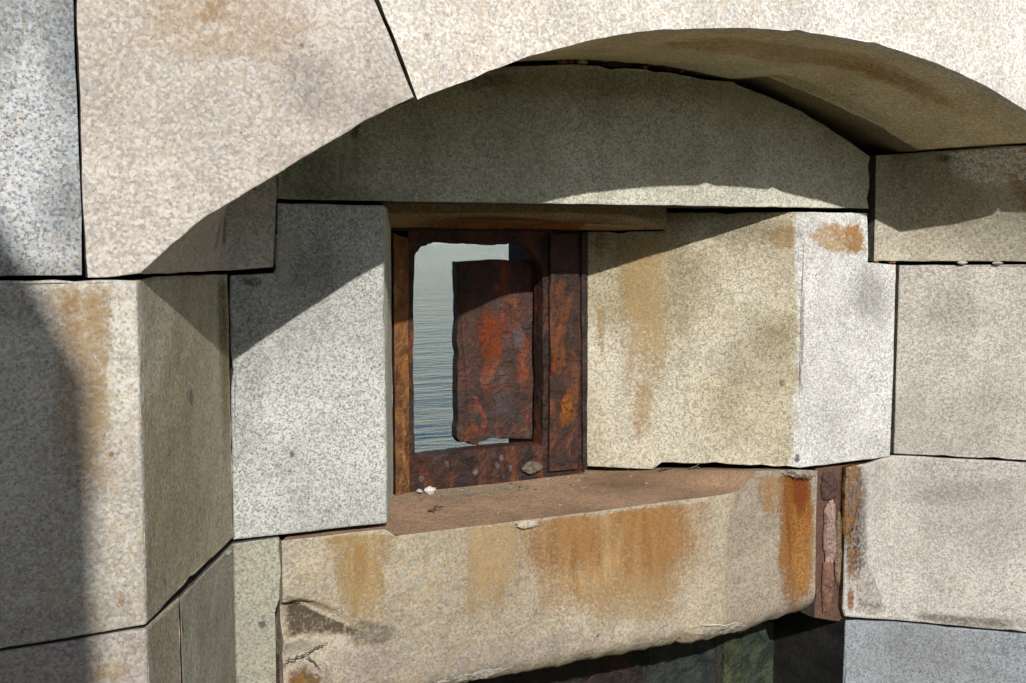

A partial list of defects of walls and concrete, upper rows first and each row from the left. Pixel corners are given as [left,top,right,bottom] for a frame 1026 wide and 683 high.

corrosion [813,224,864,252]
corrosion [559,389,574,425]
corrosion [760,475,814,601]
corrosion [843,465,862,608]
corrosion [290,668,319,683]